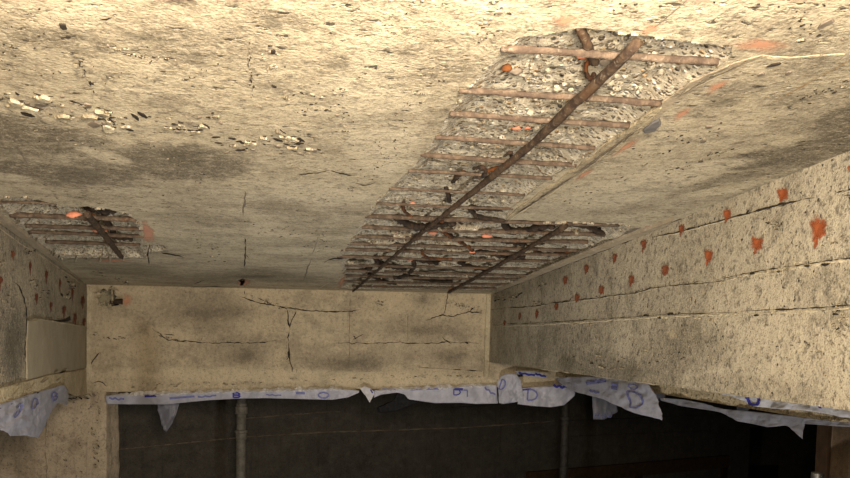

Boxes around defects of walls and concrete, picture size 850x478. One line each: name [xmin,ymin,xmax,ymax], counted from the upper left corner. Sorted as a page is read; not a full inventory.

spalling [301,1,733,313]
spalling [0,196,168,262]
crack [625,197,814,238]
rust [751,237,763,255]
rust [810,218,826,248]
crack [429,277,741,320]
peeling [26,316,125,394]
crack [154,291,361,371]
crack [339,334,480,344]